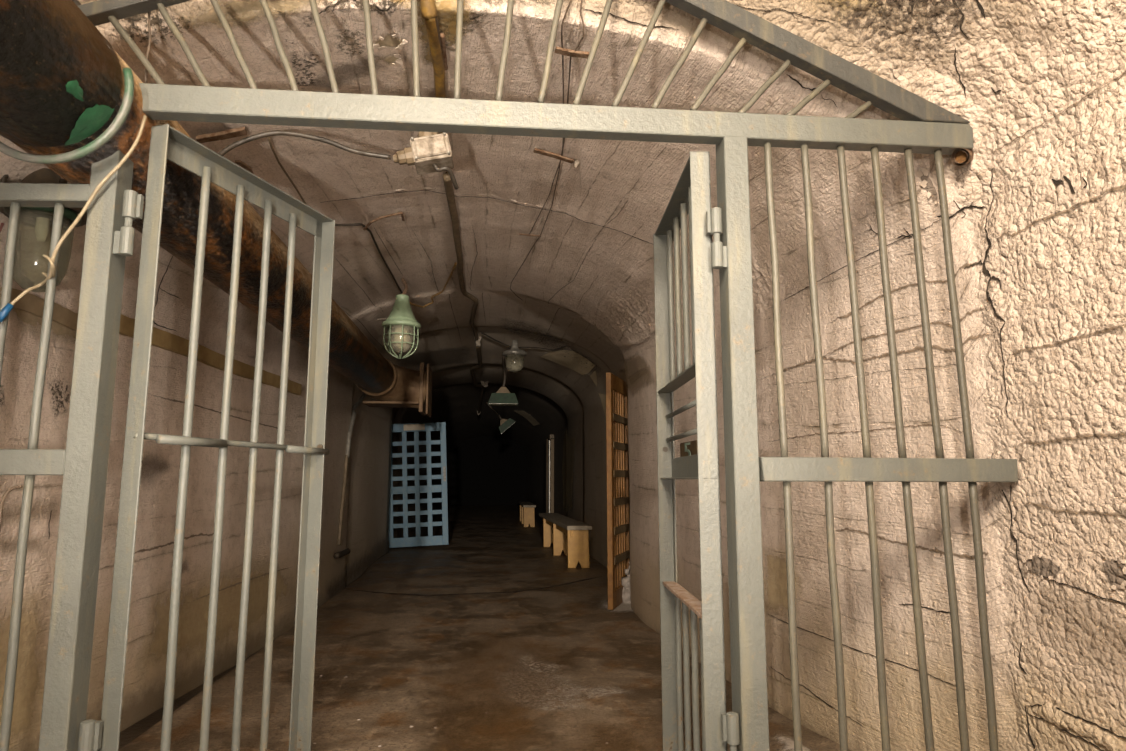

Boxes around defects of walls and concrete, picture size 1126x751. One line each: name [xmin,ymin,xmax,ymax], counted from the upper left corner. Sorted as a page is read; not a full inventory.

crack [1052,175,1087,194]
crack [320,190,654,352]
spalling [1023,555,1060,580]
spalling [1103,556,1126,590]
crack [1025,707,1036,751]